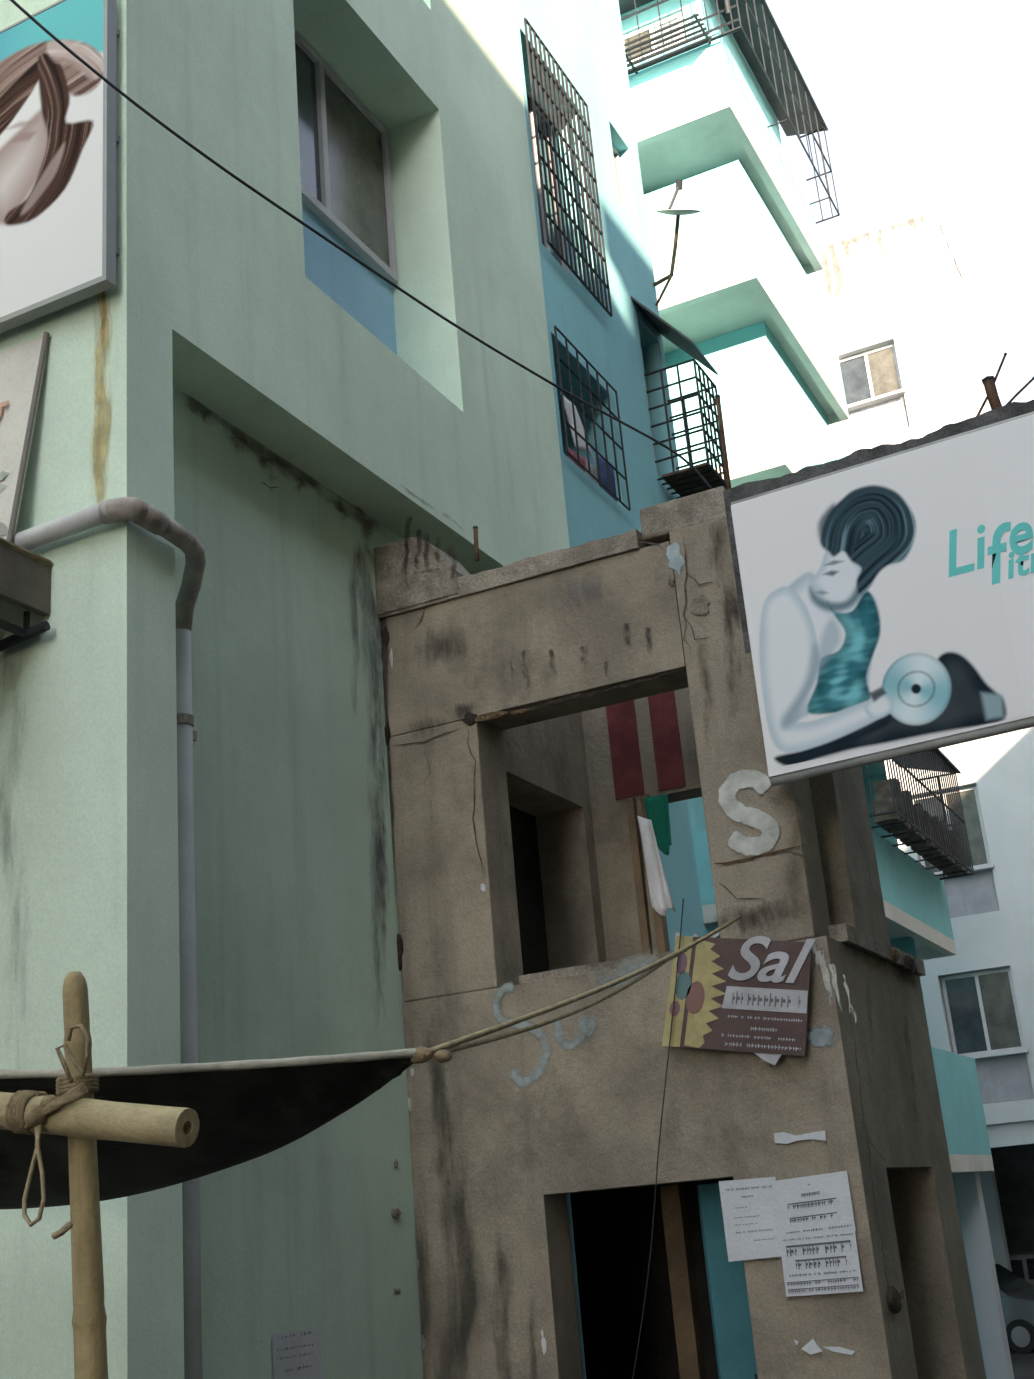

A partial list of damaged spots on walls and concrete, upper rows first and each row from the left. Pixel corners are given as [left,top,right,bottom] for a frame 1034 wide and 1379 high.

damp [820,212,976,331]
corrosion [93,292,111,502]
damp [190,398,318,488]
crack [399,728,460,781]
damp [455,1199,475,1348]